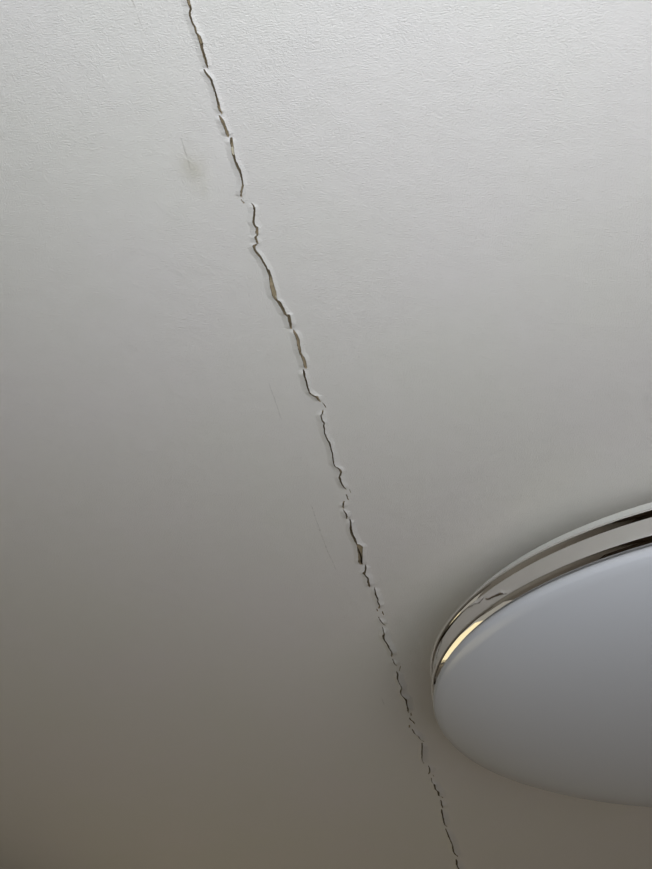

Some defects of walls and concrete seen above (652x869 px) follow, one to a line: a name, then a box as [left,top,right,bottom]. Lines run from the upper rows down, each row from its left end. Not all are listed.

crack [181,0,466,869]